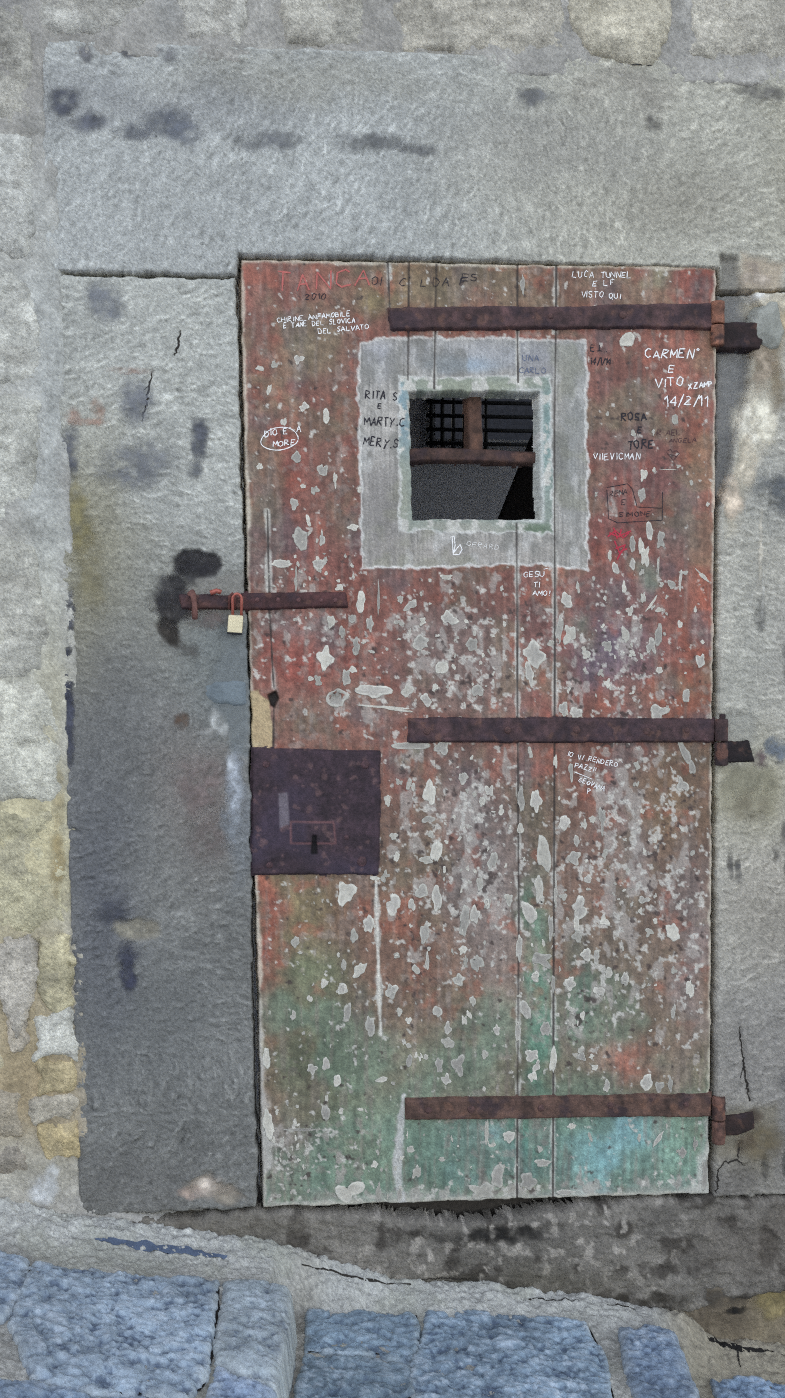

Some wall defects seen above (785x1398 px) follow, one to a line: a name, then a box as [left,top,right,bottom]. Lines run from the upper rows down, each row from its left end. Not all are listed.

peeling [270,526,327,570]
peeling [641,521,665,568]
peeling [523,591,576,688]
peeling [316,637,432,713]
peeling [650,689,690,718]
peeling [517,786,543,813]
peeling [338,881,357,907]
peeling [350,884,442,944]
peeling [516,835,581,970]
peeling [515,1000,557,1073]
peeling [262,1108,274,1142]
crack [708,1336,784,1367]